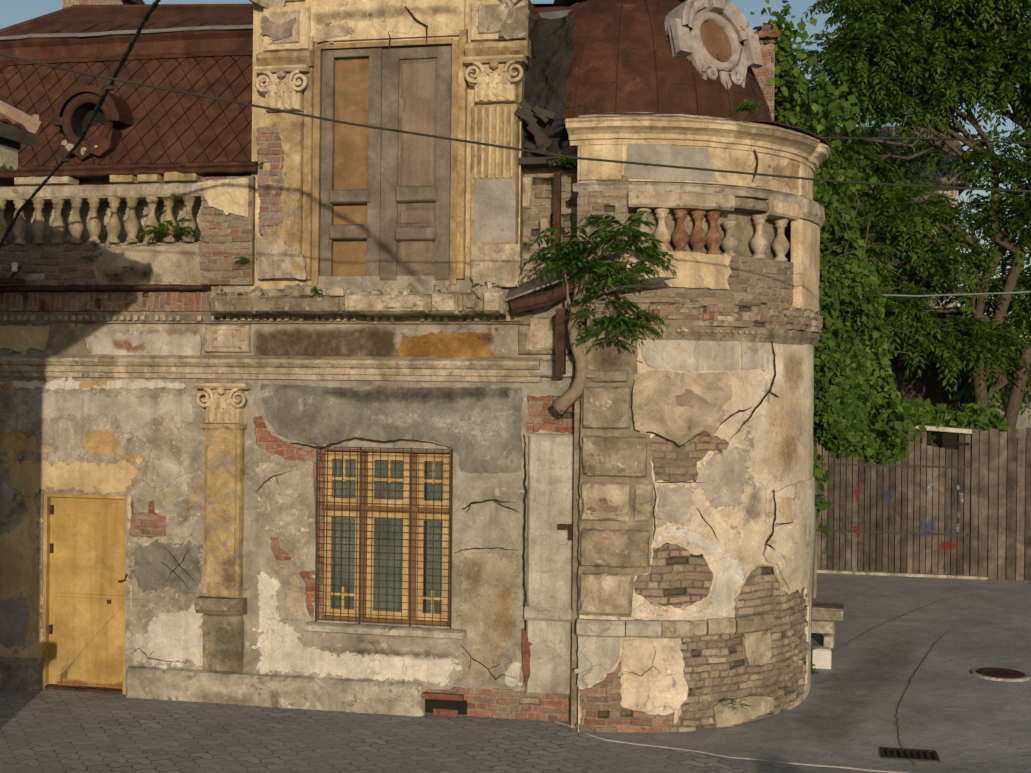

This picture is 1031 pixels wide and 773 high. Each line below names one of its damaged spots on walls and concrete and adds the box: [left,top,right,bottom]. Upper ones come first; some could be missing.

crack [405,6,428,44]
crack [290,437,451,449]
flaking render [526,395,575,433]
flaking render [640,429,728,483]
crack [630,341,780,447]
peeling [0,416,167,659]
flaking render [254,416,324,620]
crack [454,434,527,631]
crack [764,489,794,552]
flaking render [634,542,712,611]
flaking render [345,564,810,733]